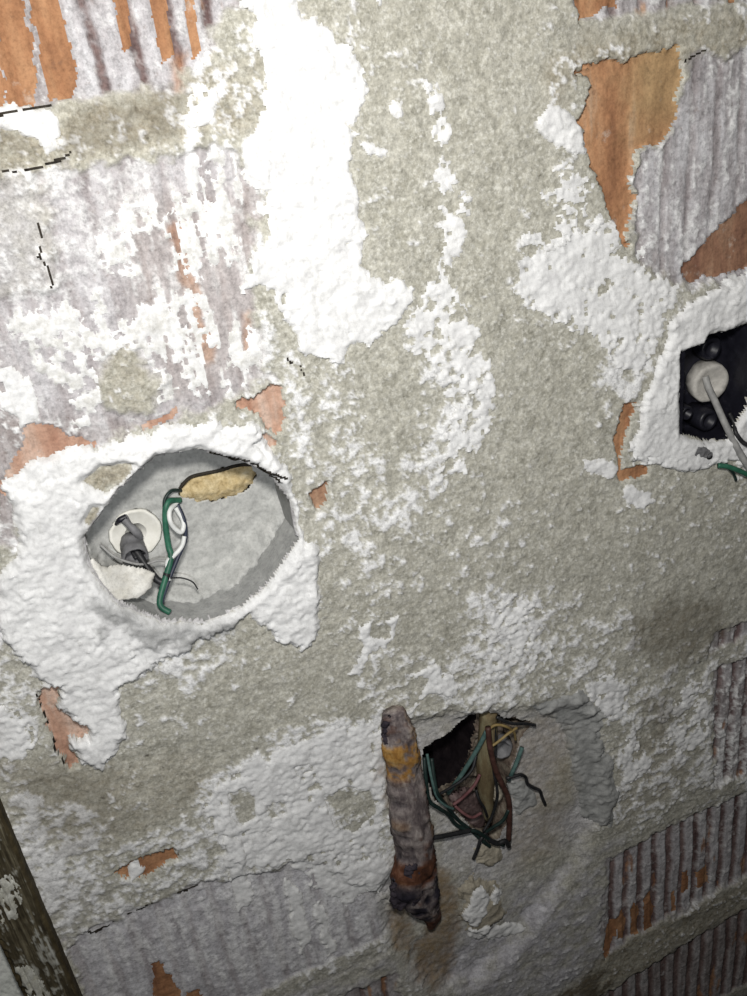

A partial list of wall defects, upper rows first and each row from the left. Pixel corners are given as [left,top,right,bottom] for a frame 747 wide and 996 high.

spalling [574,0,617,21]
crack [0,104,52,117]
crack [2,151,72,173]
peeling [512,44,747,376]
peeling [0,0,497,496]
peeling [582,402,656,513]
peeling [585,674,630,722]
peeling [0,686,89,769]
corrosion [380,715,391,745]
peeling [658,681,713,764]
corrosion [389,863,423,911]
spalling [150,961,203,996]